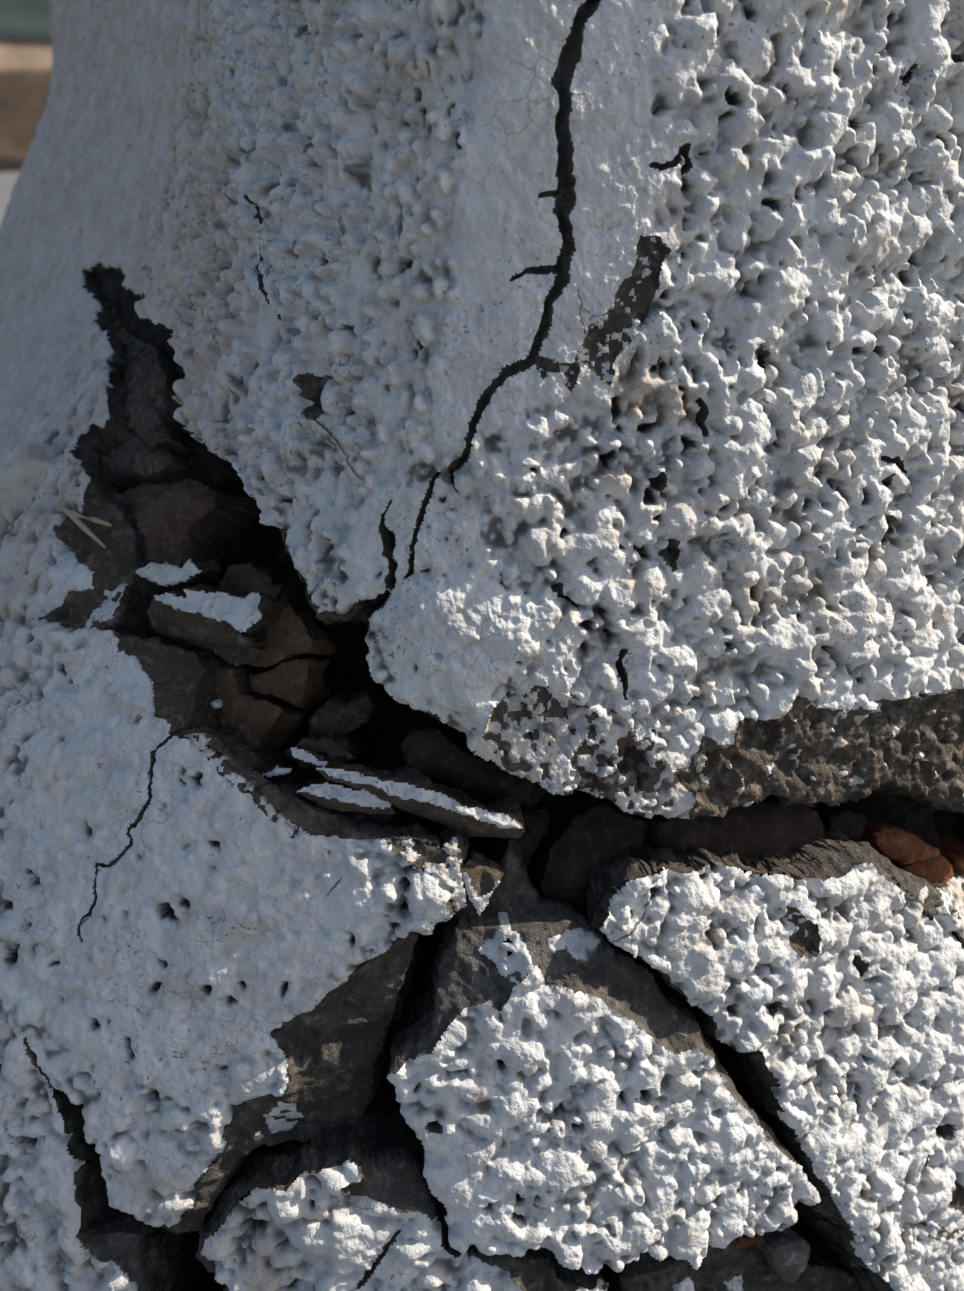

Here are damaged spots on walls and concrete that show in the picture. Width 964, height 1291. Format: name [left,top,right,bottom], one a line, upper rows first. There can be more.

damp [0,70,52,172]
crack [648,142,693,176]
crack [378,0,601,591]
peeling [536,235,672,392]
crack [314,417,362,480]
crack [695,398,710,437]
crack [880,455,907,475]
spalling [38,262,964,1291]
crack [76,728,186,943]